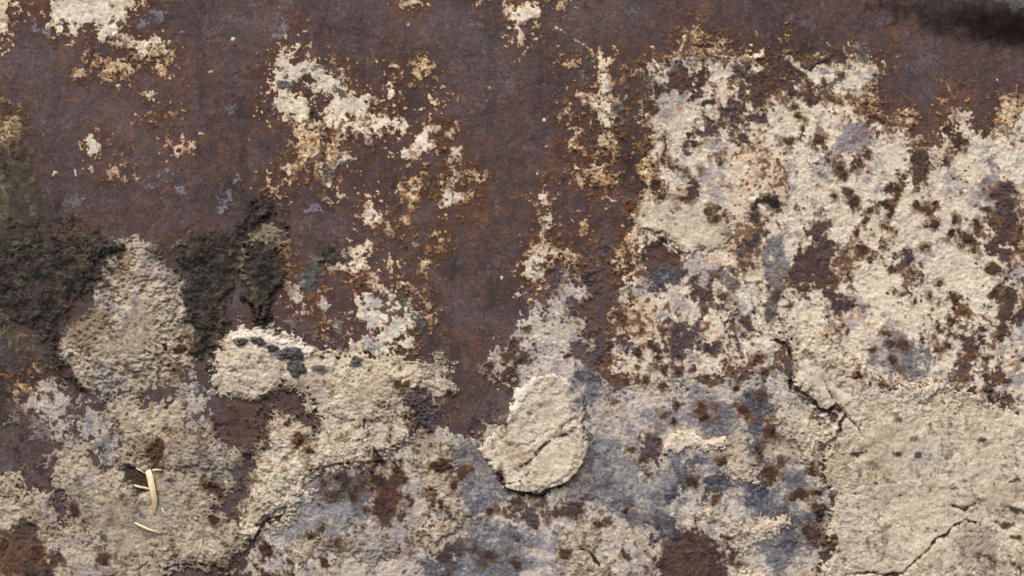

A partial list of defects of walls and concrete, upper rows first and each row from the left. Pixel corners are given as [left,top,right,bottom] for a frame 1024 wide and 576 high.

peeling [229,15,494,358]
peeling [471,0,1024,409]
rust [539,47,1024,485]
peeling [0,354,89,447]
peeling [372,374,443,429]
crack [770,331,854,434]
spalling [0,516,73,576]
spalling [117,463,155,502]
rust [253,539,308,576]
rust [316,451,447,530]
rust [427,457,475,489]
rust [787,486,838,551]